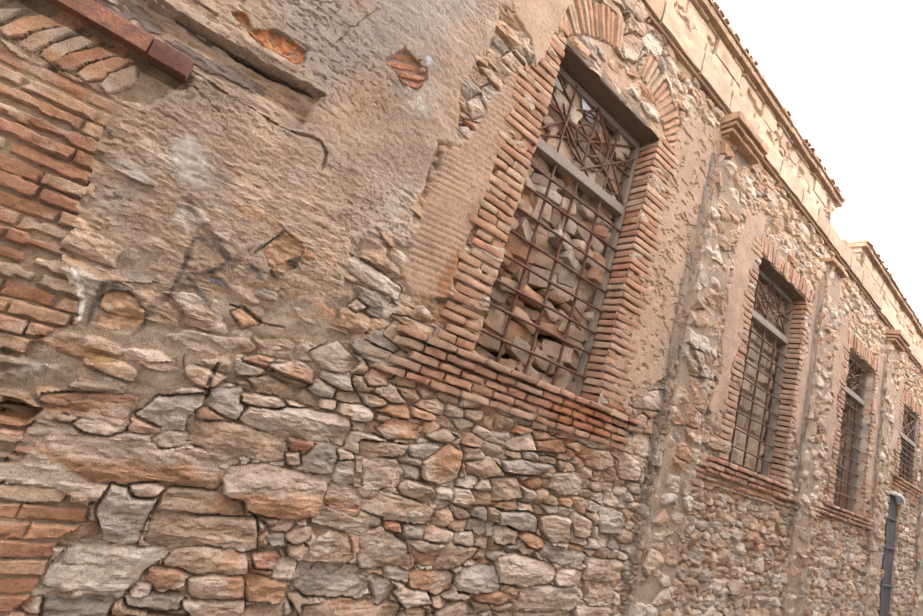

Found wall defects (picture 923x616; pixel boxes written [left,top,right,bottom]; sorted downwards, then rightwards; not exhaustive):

peeling [94,0,266,96]
spalling [234,11,305,72]
spalling [388,49,441,118]
crack [185,73,328,164]
spalling [263,233,303,279]
spalling [97,291,145,330]